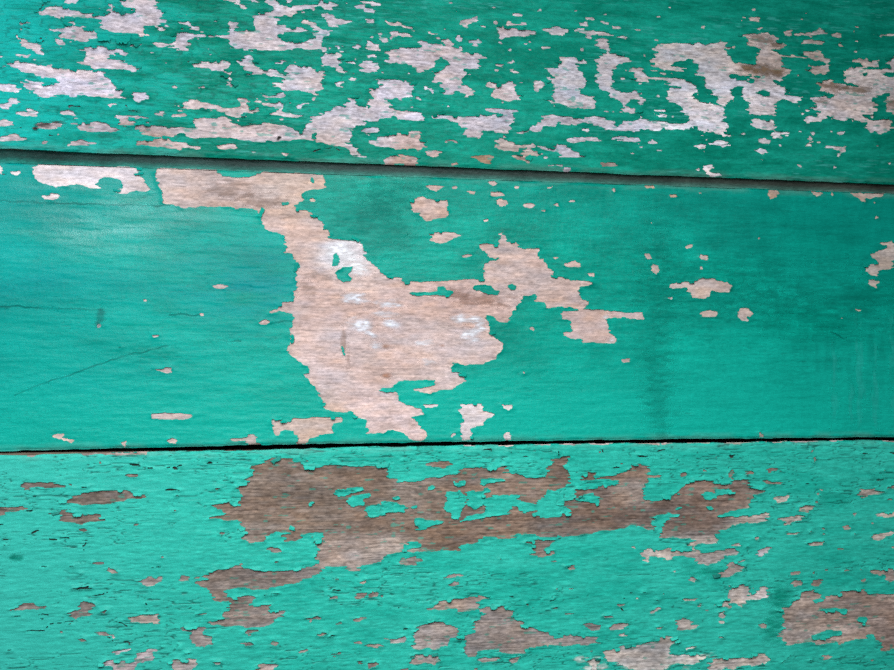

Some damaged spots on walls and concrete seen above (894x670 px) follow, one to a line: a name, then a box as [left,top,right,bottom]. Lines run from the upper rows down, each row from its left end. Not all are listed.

peeling [0,0,894,172]
peeling [702,165,721,177]
peeling [863,241,894,288]
peeling [32,164,644,445]
peeling [669,278,732,299]
peeling [738,308,753,321]
peeling [179,455,815,647]
peeling [128,614,160,624]
peeling [354,595,770,670]
peeling [777,568,894,660]
peeling [98,648,158,670]
peeling [167,658,198,670]